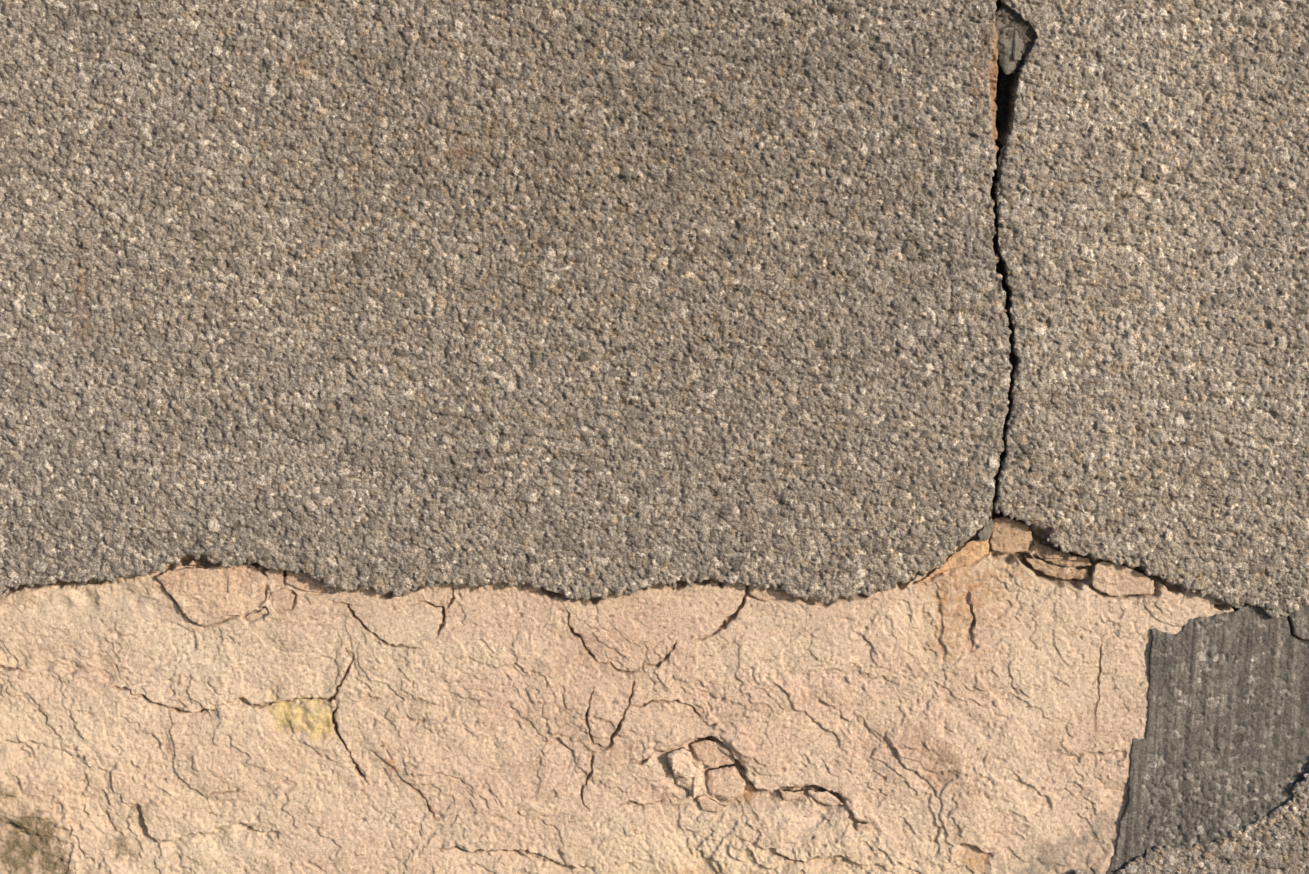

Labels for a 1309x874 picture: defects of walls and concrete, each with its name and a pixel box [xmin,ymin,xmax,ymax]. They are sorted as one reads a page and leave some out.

crack [988,0,1038,510]
crack [110,585,576,868]
spalling [0,509,1309,874]
crack [561,585,749,812]
crack [741,764,769,790]
crack [773,852,842,863]